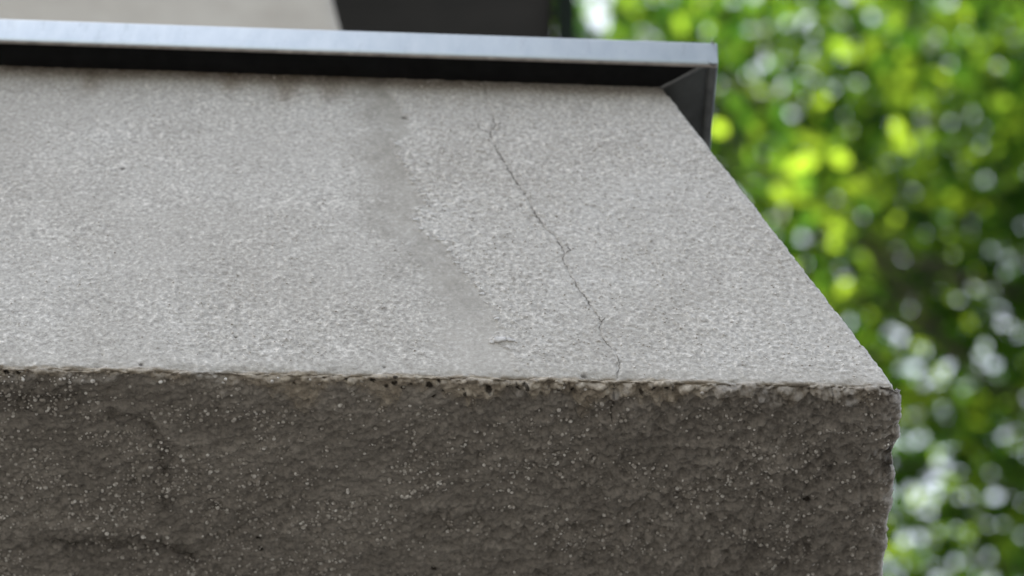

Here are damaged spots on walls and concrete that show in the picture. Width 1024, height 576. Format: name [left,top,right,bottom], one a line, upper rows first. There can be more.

crack [478,119,518,185]
crack [557,241,620,419]